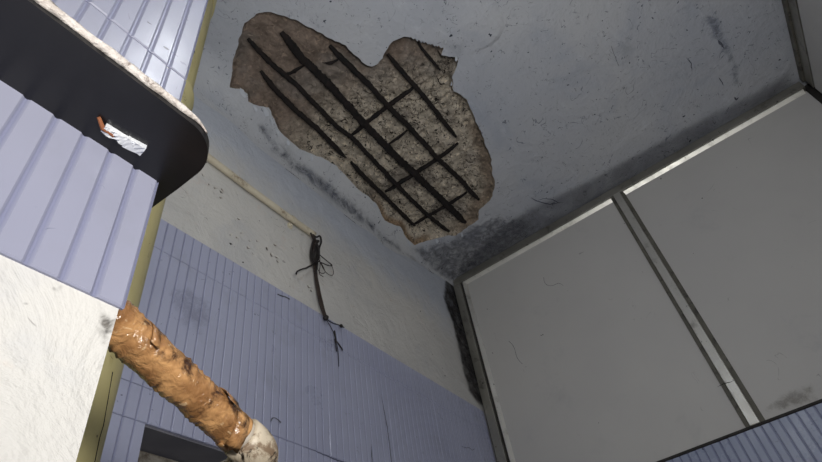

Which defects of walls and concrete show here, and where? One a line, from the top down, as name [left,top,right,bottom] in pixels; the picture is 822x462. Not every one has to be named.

leakage [296,166,374,230]
spalling [230,12,495,246]
leakage [421,221,523,405]